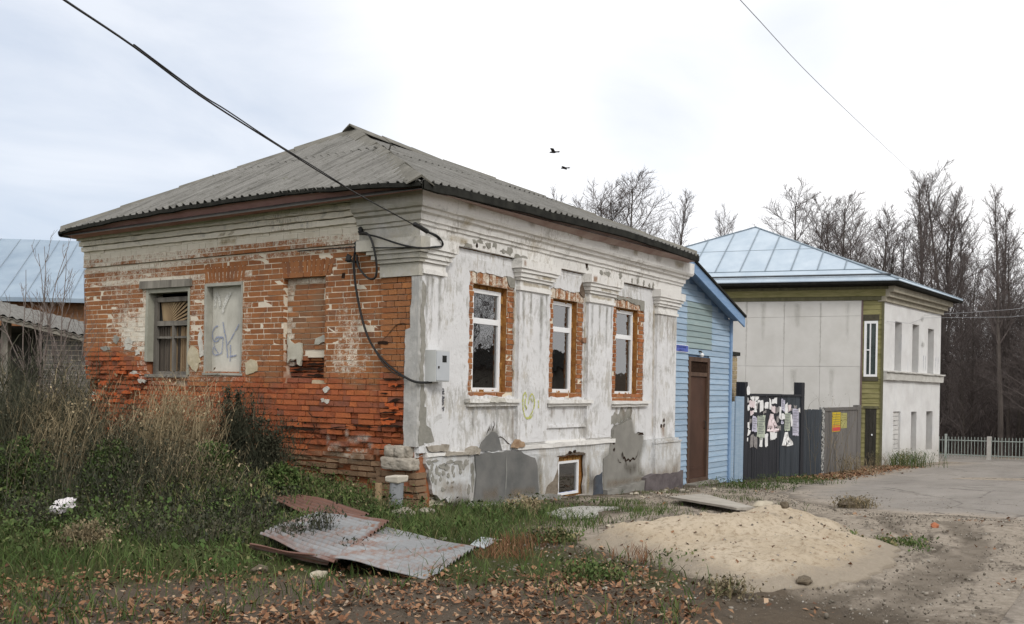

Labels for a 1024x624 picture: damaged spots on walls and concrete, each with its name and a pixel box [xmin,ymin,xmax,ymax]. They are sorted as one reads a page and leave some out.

peeling [464,238,528,259]
spalling [89,335,147,404]
peeling [187,327,204,372]
peeling [244,359,259,375]
peeling [287,335,330,404]
spalling [380,378,404,425]
peeling [418,280,481,495]
peeling [611,407,632,425]